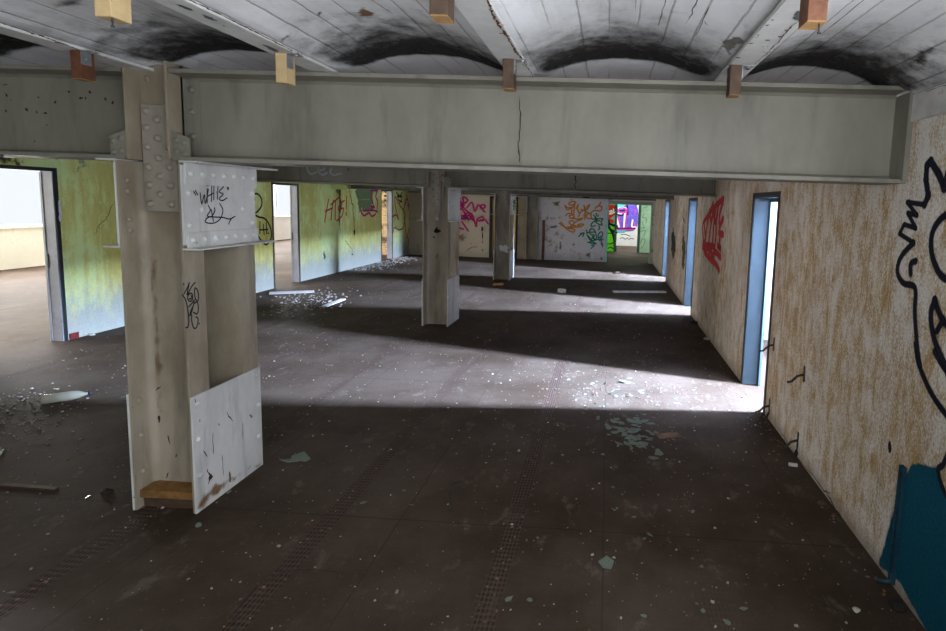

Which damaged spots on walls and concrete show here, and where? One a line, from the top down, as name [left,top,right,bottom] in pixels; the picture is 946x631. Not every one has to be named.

leakage [723,37,743,53]
crack [515,98,523,163]